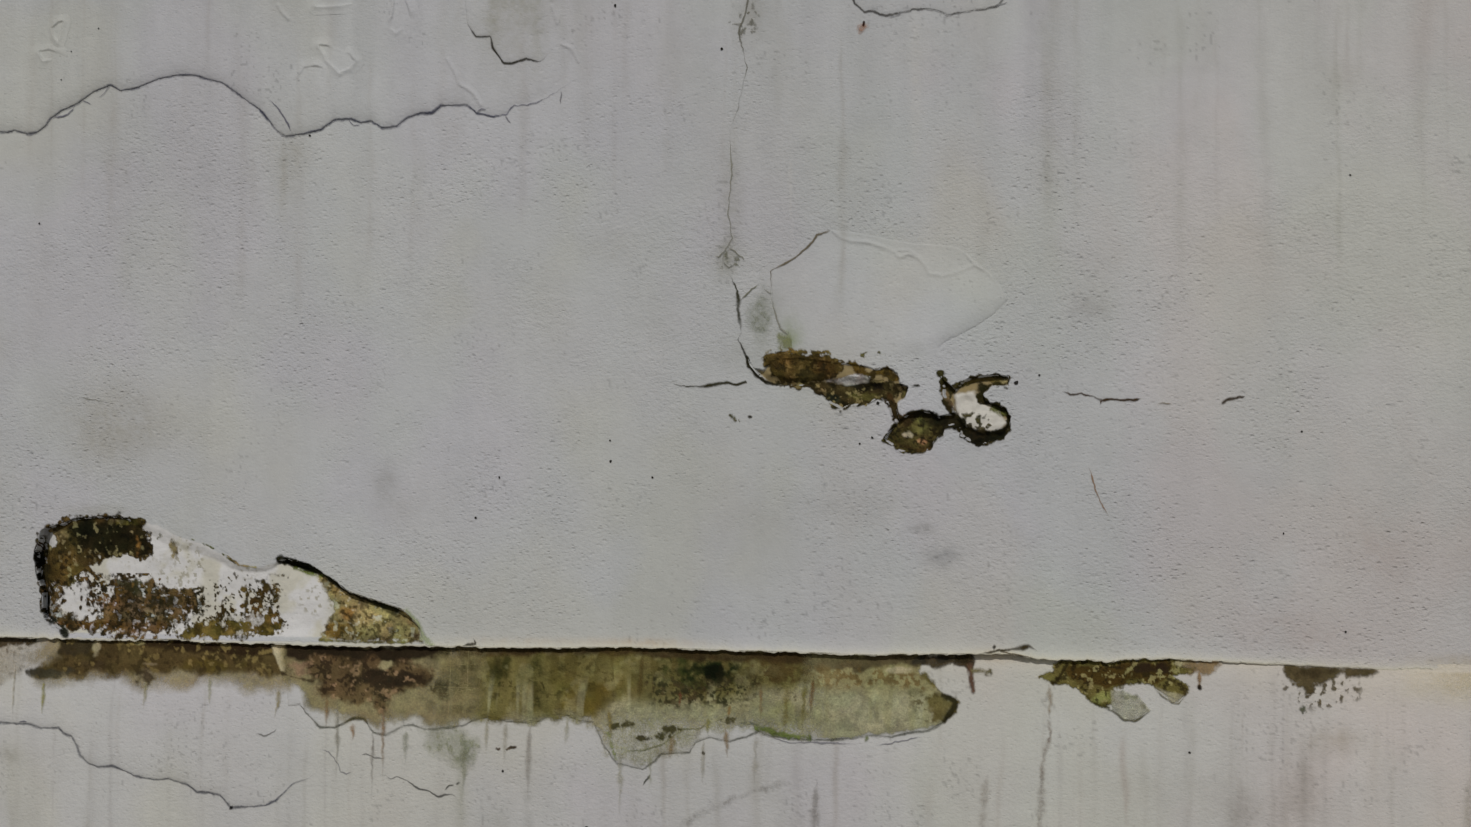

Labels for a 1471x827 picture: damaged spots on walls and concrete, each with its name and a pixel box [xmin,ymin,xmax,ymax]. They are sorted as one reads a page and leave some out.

crack [471,30,538,64]
crack [2,74,383,135]
crack [676,145,828,387]
spalling [744,348,1014,457]
spalling [31,512,432,646]
water stain [0,637,37,655]
crack [6,721,292,809]
peeling [0,673,485,808]
water stain [277,645,479,769]
peeling [579,694,941,770]
water stain [954,654,992,693]
water stain [1283,665,1377,714]